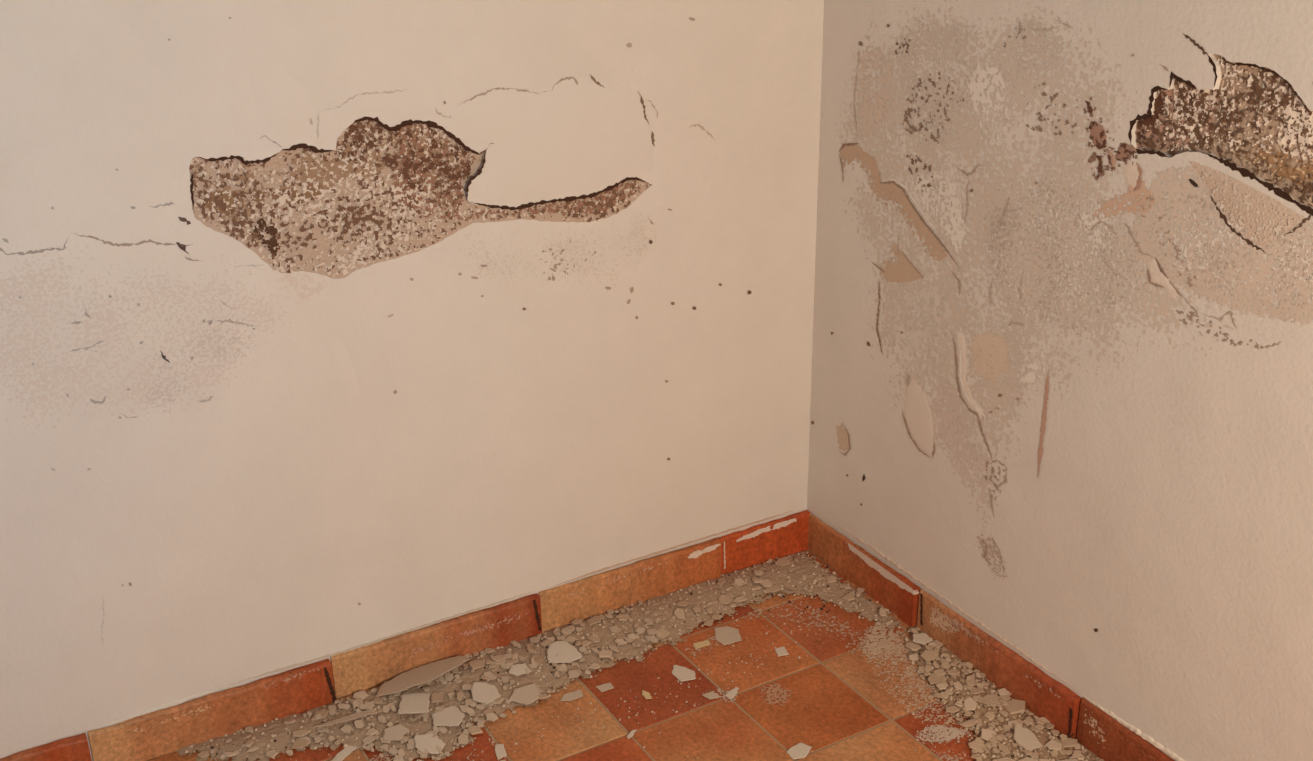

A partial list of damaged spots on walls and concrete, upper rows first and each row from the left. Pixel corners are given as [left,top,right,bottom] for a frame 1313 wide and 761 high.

crack [0,202,200,261]
spalling [189,117,651,279]